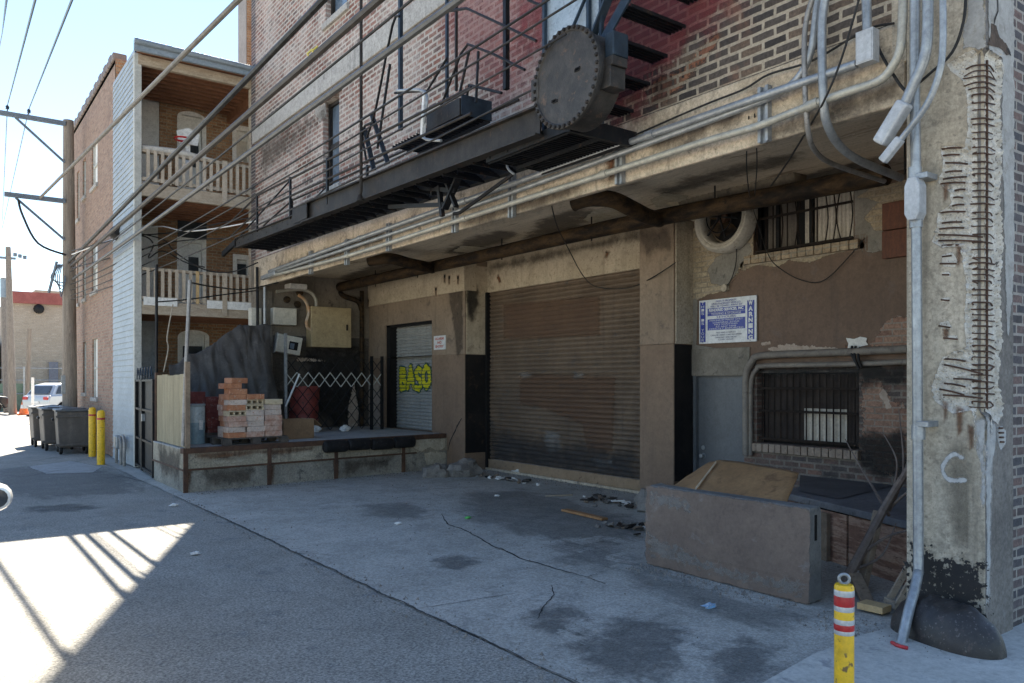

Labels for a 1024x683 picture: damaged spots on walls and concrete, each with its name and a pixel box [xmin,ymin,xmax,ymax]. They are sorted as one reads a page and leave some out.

spalling [931,0,1015,450]
peeling [869,314,907,347]
peeling [859,380,907,455]
rust [944,402,973,447]
crack [173,494,580,683]
crack [442,515,605,619]